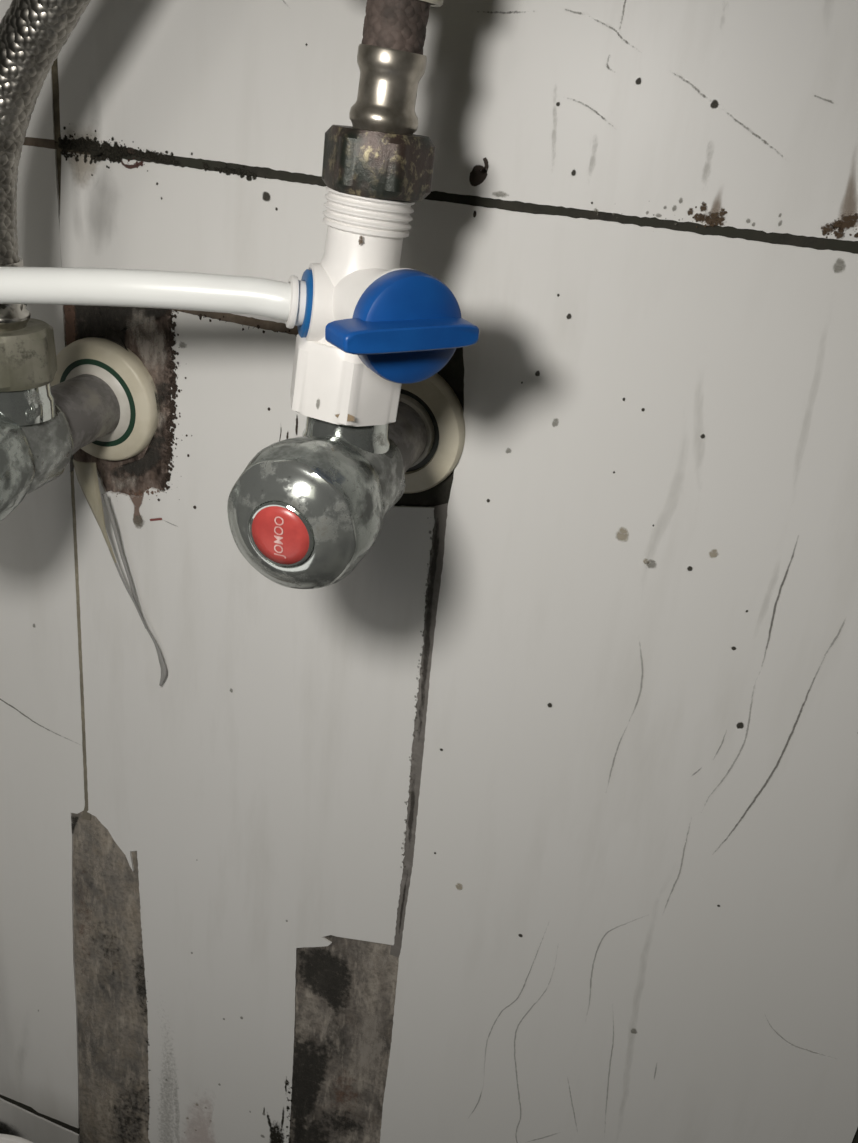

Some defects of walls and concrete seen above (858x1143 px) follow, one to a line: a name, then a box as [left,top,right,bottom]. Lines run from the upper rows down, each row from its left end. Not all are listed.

water stain [58,127,178,176]
water stain [203,162,257,181]
water stain [469,157,489,186]
water stain [130,495,143,526]
crack [0,699,50,731]
crack [732,678,815,831]
peeling [71,811,150,1143]
peeling [286,935,399,1143]